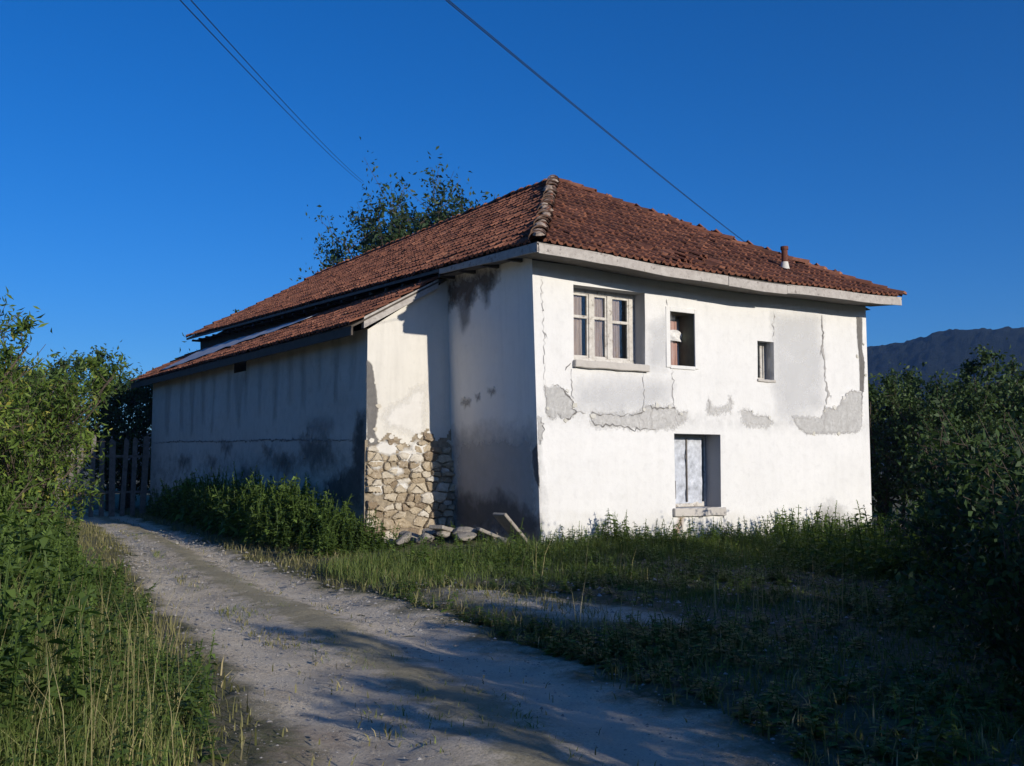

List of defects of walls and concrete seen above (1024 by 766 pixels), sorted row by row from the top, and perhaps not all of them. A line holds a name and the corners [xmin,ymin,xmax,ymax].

peeling [325,360,455,542]
leakage [447,269,497,306]
crack [541,278,574,408]
spalling [532,384,687,487]
spalling [707,397,773,428]
crack [820,318,832,431]
spalling [793,317,867,436]